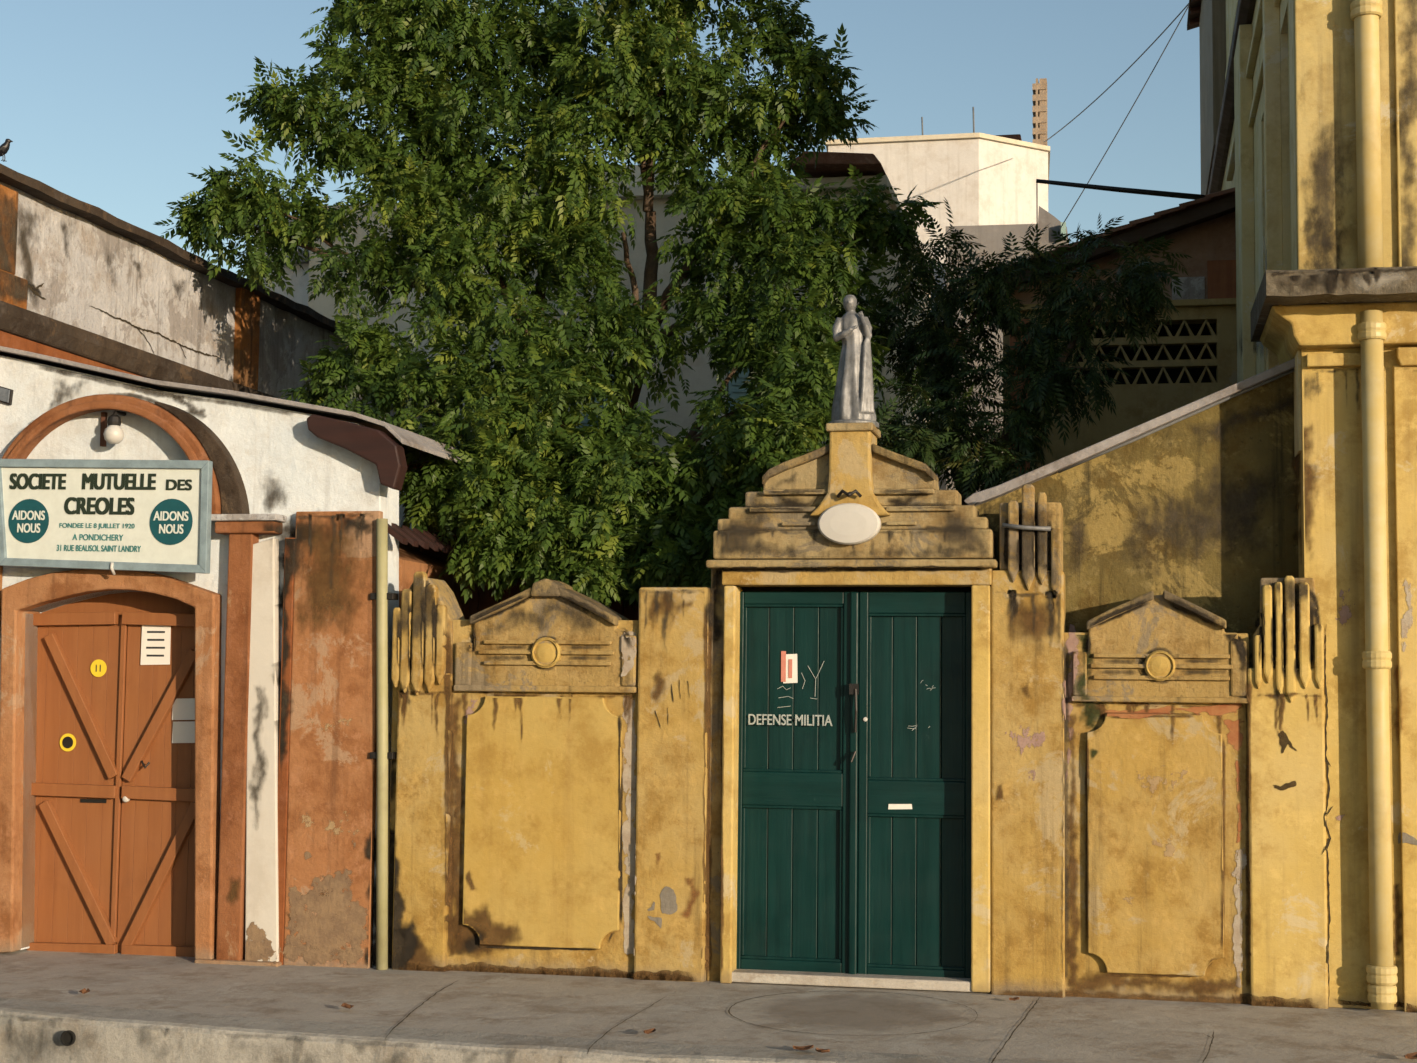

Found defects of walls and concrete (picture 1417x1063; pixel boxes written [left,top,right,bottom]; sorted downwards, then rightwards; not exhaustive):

damp [1394,0,1417,184]
damp [1272,135,1417,293]
crack [91,306,222,360]
damp [1003,511,1051,576]
damp [365,577,692,981]
peeling [619,630,638,676]
peeling [622,697,677,955]
damp [638,480,983,970]
peeling [1005,725,1045,754]
damp [1003,582,1321,1008]
spalling [245,869,368,966]
damp [1394,1001,1417,1013]